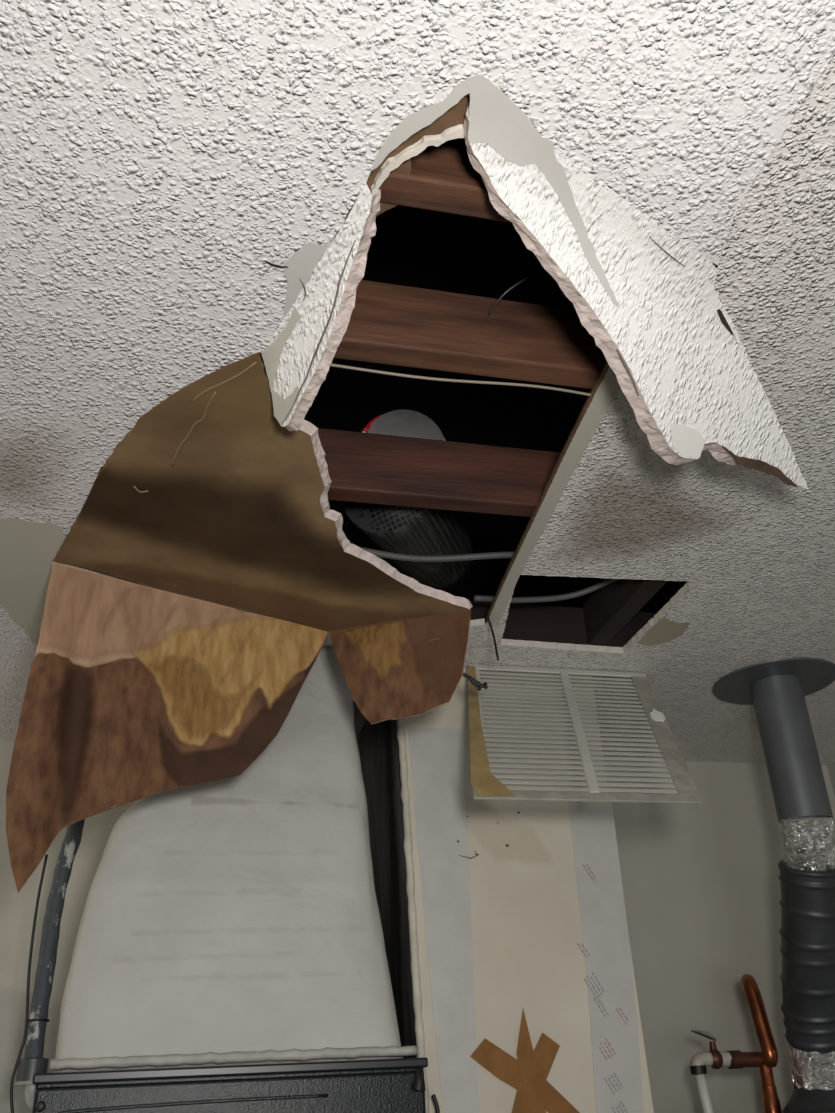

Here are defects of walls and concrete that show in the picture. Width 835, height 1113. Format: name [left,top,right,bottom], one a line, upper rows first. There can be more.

spalling [284,102,752,621]
damp [80,470,409,589]
damp [6,563,471,892]